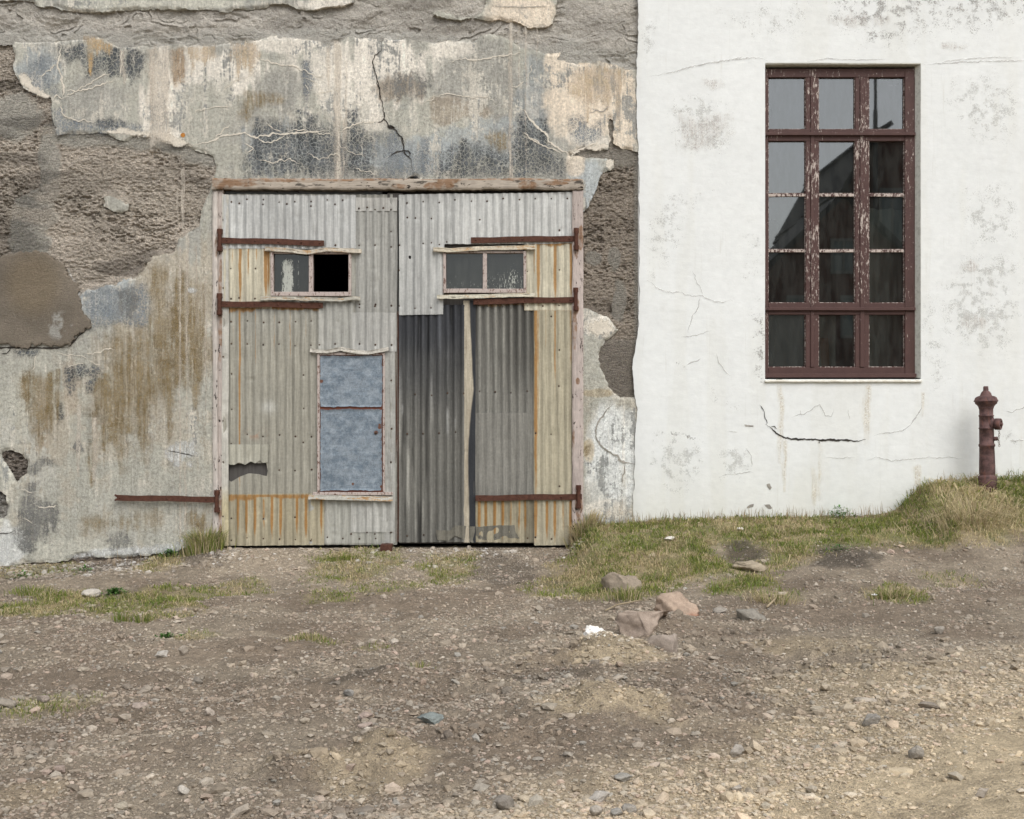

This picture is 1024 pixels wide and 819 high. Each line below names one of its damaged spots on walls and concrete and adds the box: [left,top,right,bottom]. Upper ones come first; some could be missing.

spalling [0,0,638,296]
crack [372,38,416,176]
spalling [570,119,638,398]
leakage [21,249,206,482]
crack [647,273,729,375]
spalling [0,491,9,518]
spalling [2,450,28,480]
crack [595,404,633,484]
crack [761,404,961,461]